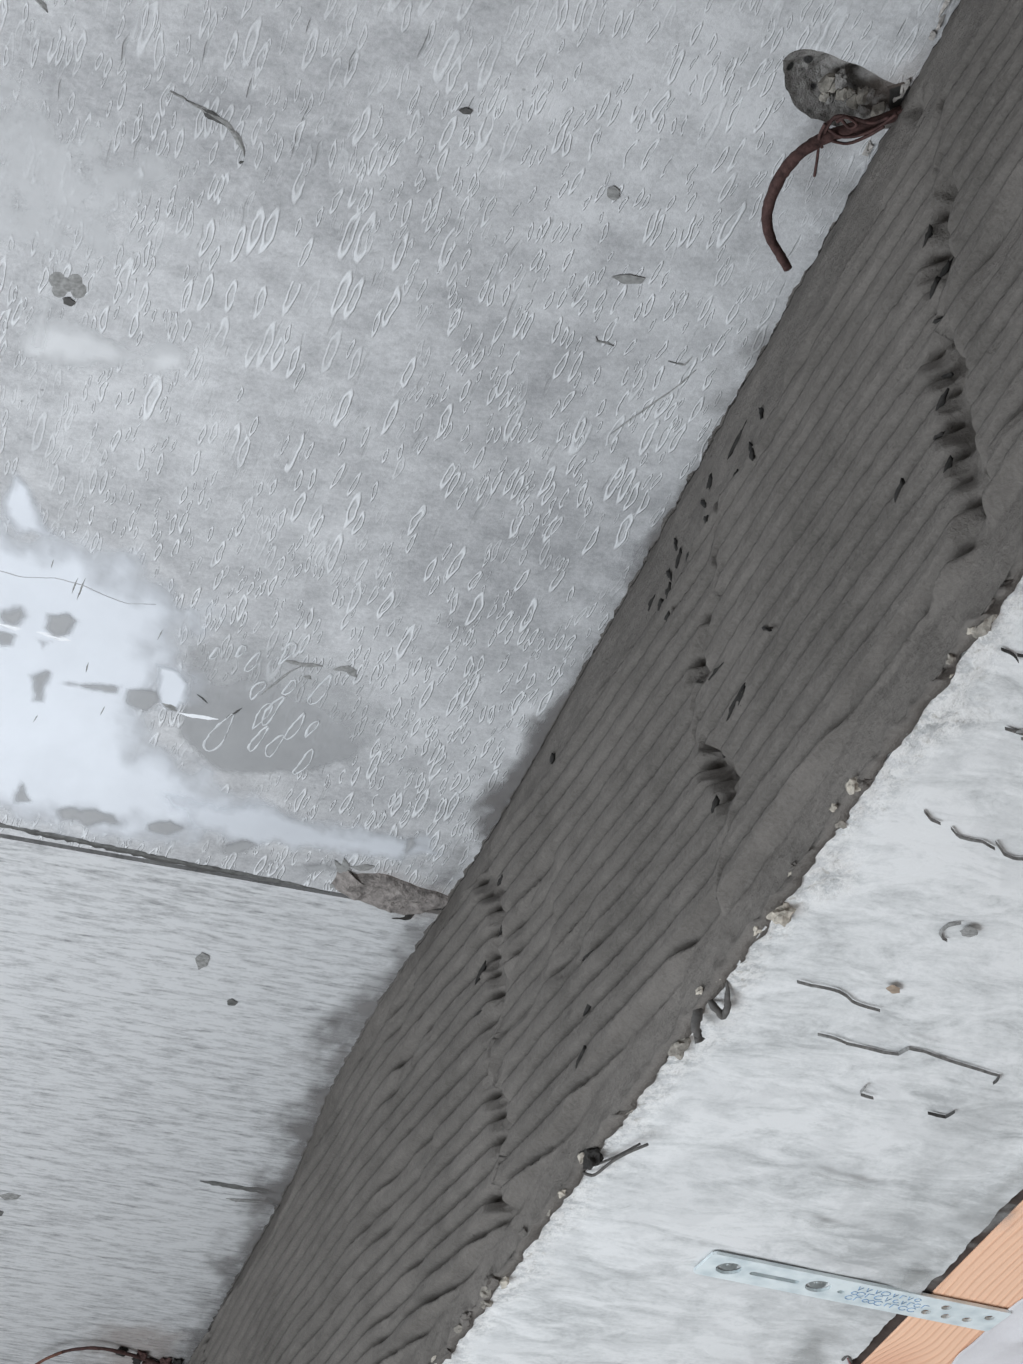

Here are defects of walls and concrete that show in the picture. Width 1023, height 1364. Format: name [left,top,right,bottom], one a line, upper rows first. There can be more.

spalling [761,49,911,272]
water stain [0,478,426,858]
crack [1001,647,1023,663]
peeling [16,786,29,802]
peeling [59,808,116,825]
peeling [149,822,181,835]
crack [924,810,1023,861]
spalling [305,858,449,920]
crack [797,980,880,1012]
crack [818,1033,1000,1085]